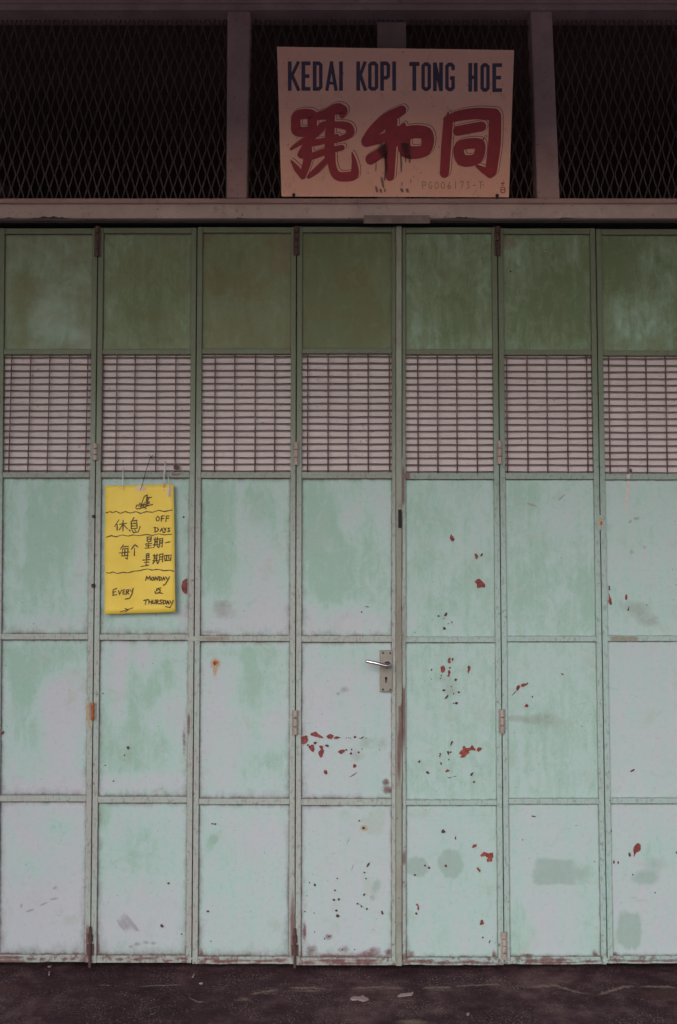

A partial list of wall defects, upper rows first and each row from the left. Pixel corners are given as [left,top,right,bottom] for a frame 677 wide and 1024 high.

peeling [431,657,471,705]
peeling [301,731,367,777]
peeling [439,741,482,778]
peeling [472,844,494,873]